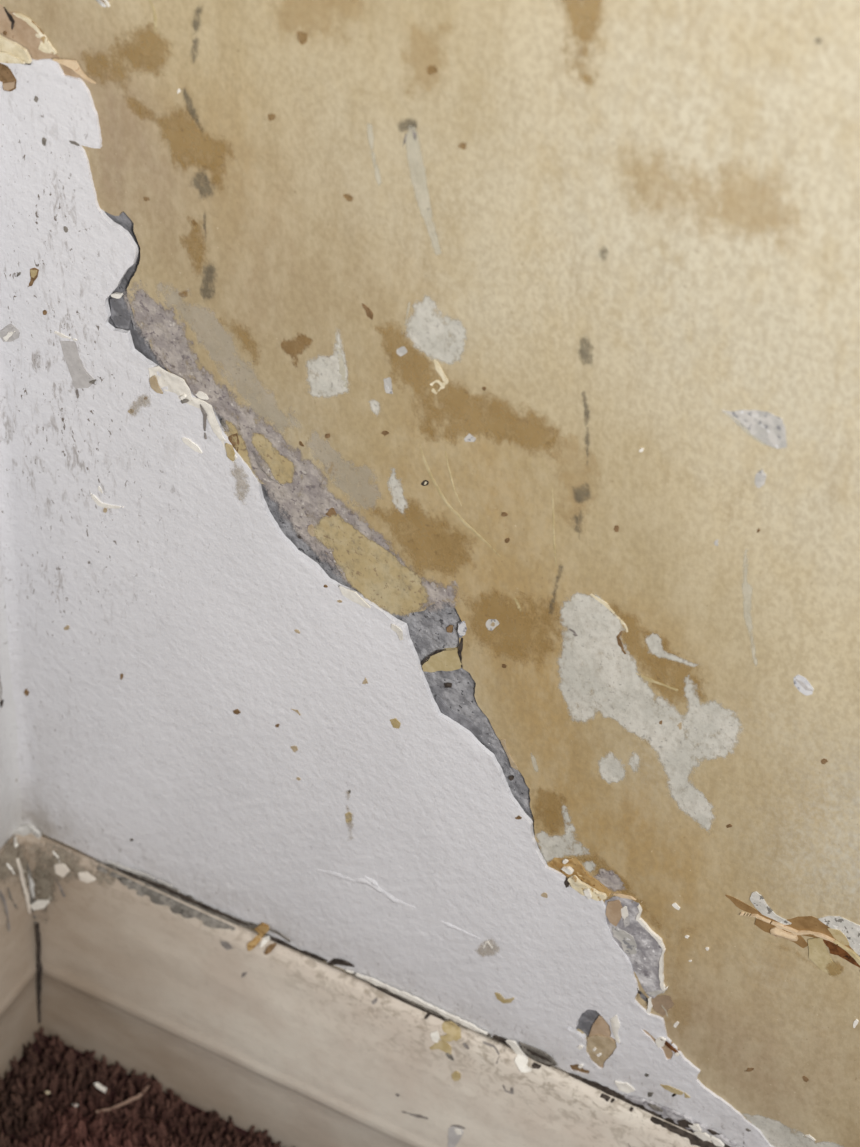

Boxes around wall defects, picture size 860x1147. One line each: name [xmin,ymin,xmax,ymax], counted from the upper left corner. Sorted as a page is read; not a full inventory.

peeling [0,34,32,91]
water stain [85,30,168,80]
water stain [564,0,601,55]
water stain [129,93,231,195]
peeling [105,211,239,463]
flaking render [396,296,466,394]
water stain [379,326,558,449]
peeling [261,484,371,609]
water stain [473,592,562,658]
water stain [614,608,701,700]
peeling [391,602,589,862]
flaking render [558,593,742,831]